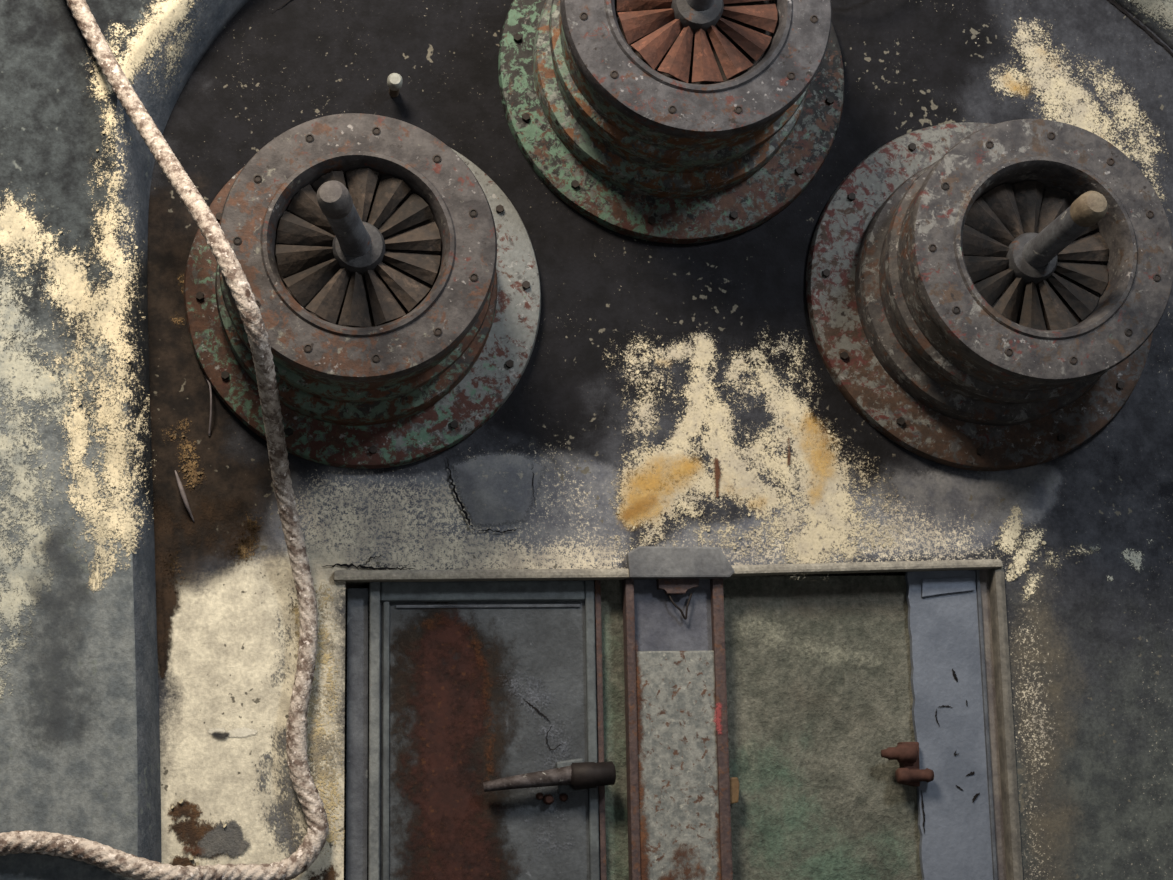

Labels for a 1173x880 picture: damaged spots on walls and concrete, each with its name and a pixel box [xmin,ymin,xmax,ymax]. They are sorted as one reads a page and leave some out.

leakage [153,499,260,678]
corrosion [389,602,521,880]